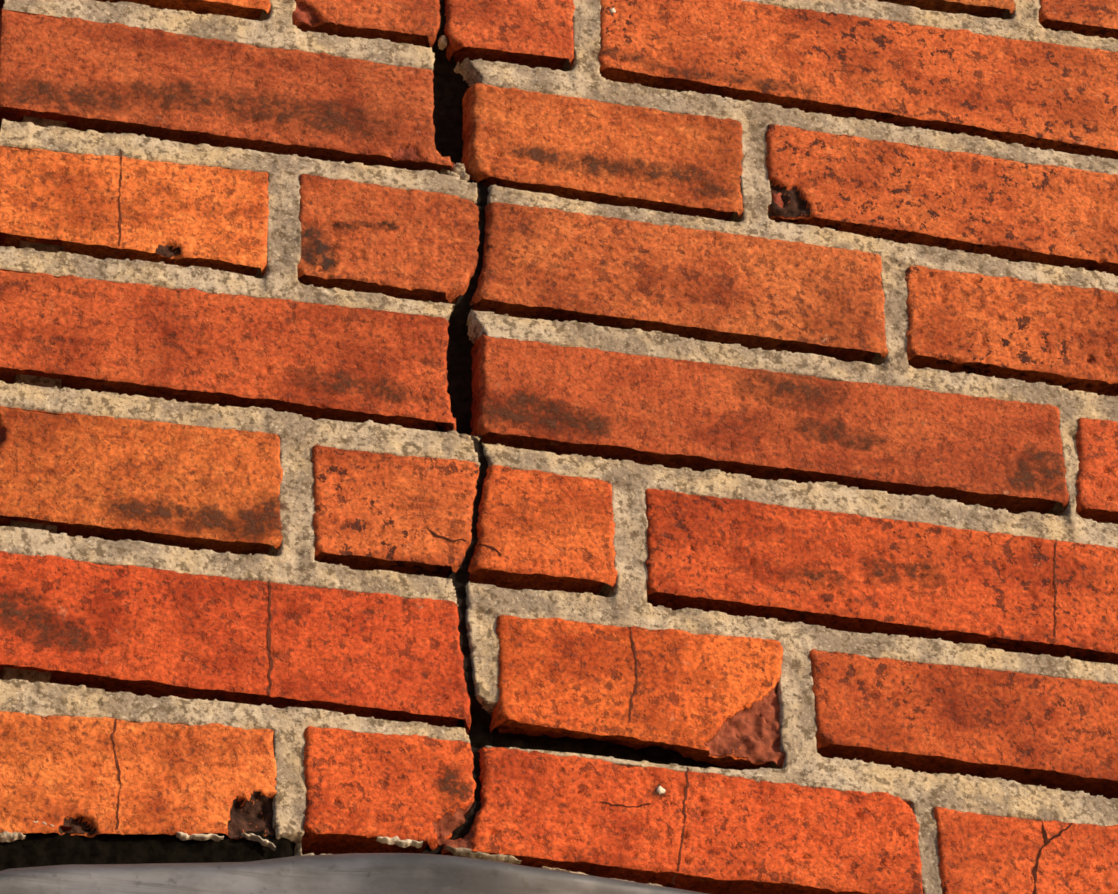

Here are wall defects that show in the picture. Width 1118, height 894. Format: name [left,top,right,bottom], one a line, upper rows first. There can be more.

spalling [768,180,811,218]
crack [421,0,501,855]
peeling [467,678,786,770]
crack [111,717,122,829]
peeling [0,791,296,871]
crack [1033,819,1072,894]